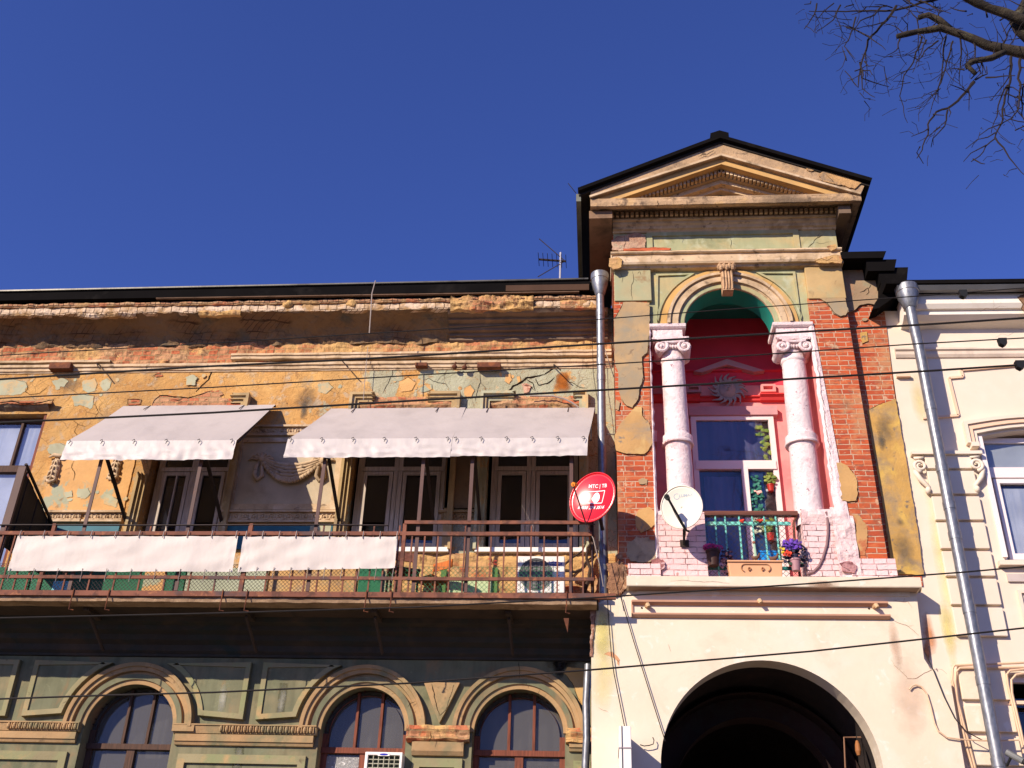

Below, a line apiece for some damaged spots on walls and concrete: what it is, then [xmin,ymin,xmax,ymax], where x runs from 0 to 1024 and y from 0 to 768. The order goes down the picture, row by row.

peeling [815,244,878,344]
spalling [77,311,137,320]
spalling [198,309,241,318]
peeling [0,378,119,409]
flaking render [127,374,224,406]
peeling [318,382,342,394]
crack [475,369,582,400]
peeling [614,302,653,455]
peeling [867,399,924,575]